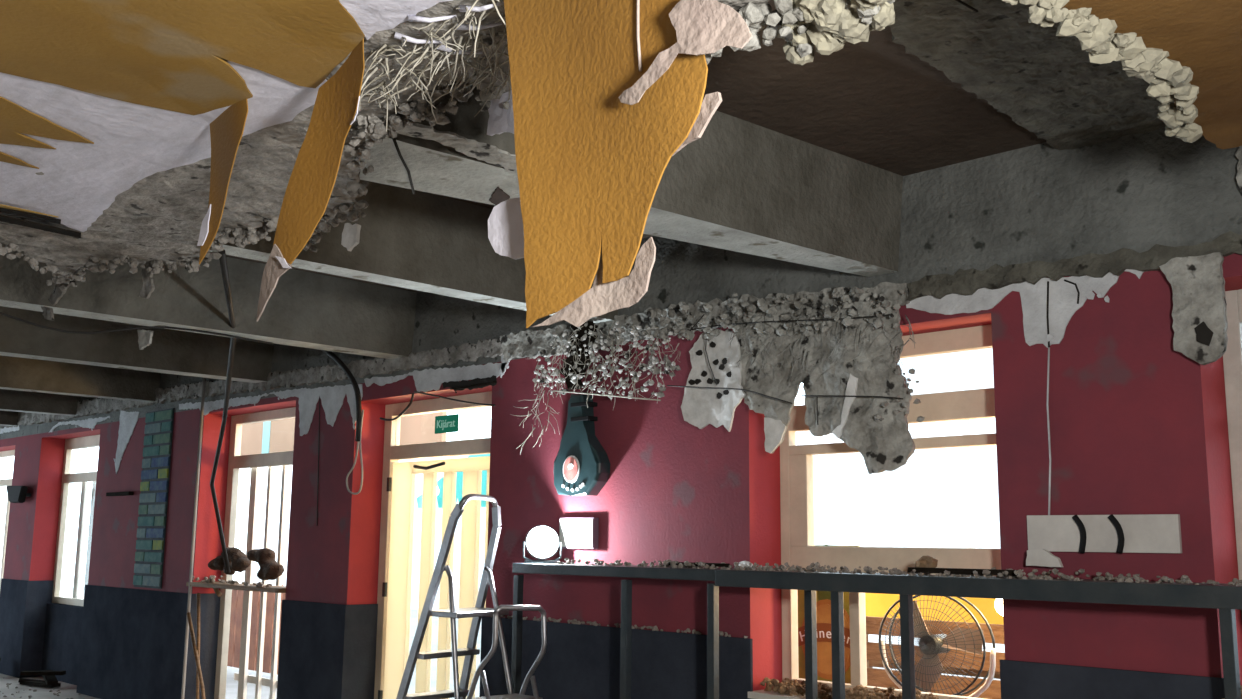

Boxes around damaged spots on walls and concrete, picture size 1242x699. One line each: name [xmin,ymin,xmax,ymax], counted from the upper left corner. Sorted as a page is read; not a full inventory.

peeling [0,0,517,322]
spalling [705,0,1174,150]